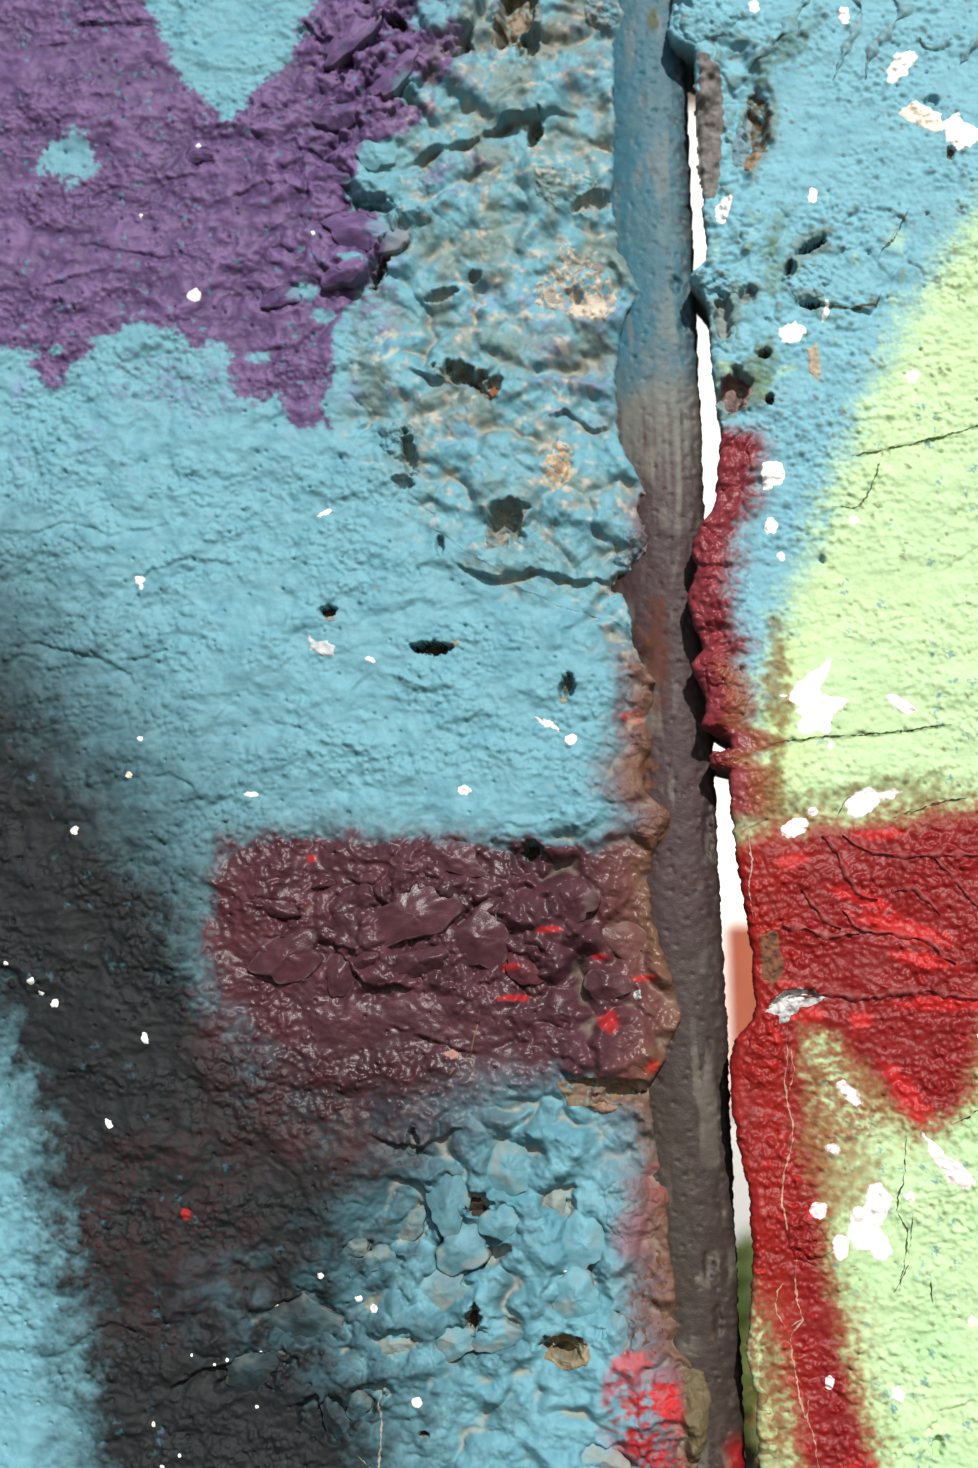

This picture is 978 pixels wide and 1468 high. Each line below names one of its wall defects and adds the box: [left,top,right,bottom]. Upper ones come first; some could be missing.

spalling [693,52,772,199]
crack [775,1026,819,1466]
crack [893,1138,933,1302]